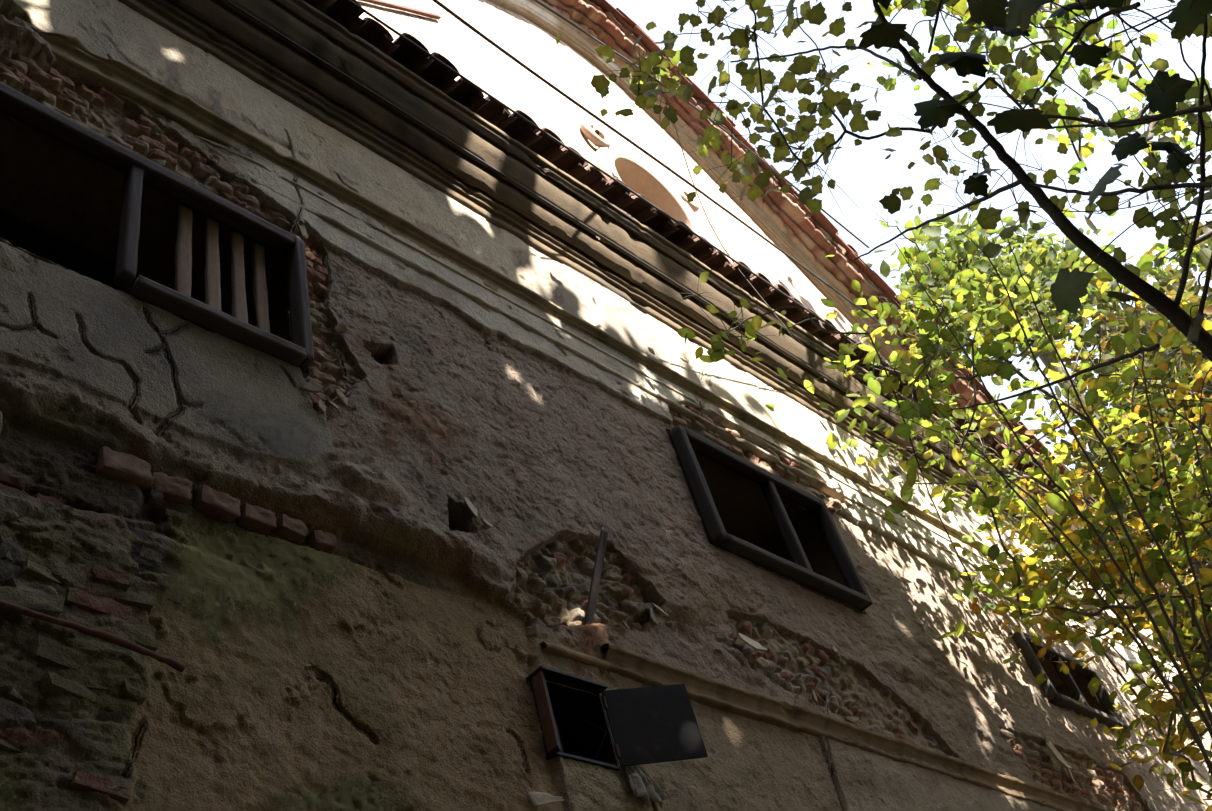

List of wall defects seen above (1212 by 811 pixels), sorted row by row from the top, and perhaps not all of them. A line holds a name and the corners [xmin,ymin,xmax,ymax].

spalling [0,48,361,414]
crack [0,295,201,436]
spalling [505,539,668,632]